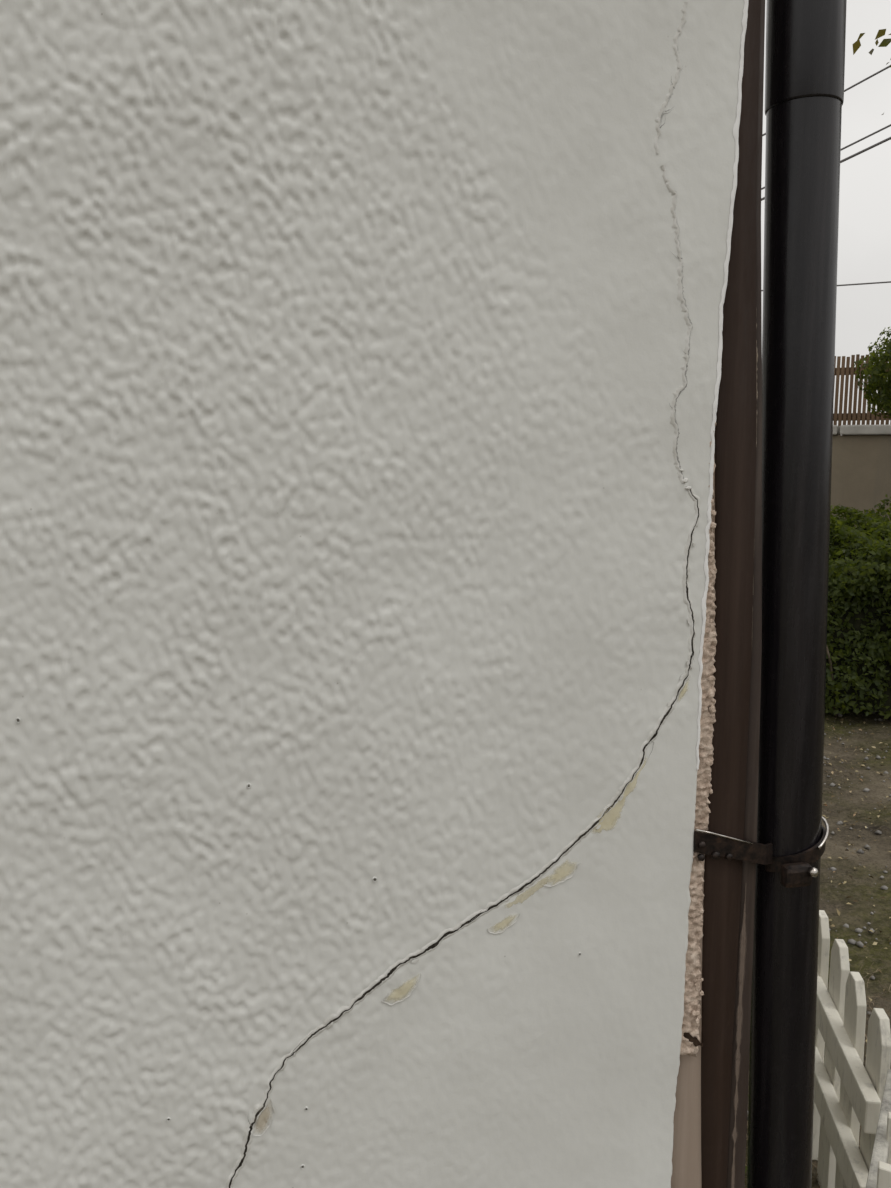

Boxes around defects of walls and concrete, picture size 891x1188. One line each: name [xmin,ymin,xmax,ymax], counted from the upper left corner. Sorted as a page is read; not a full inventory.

crack [226,2,701,1188]